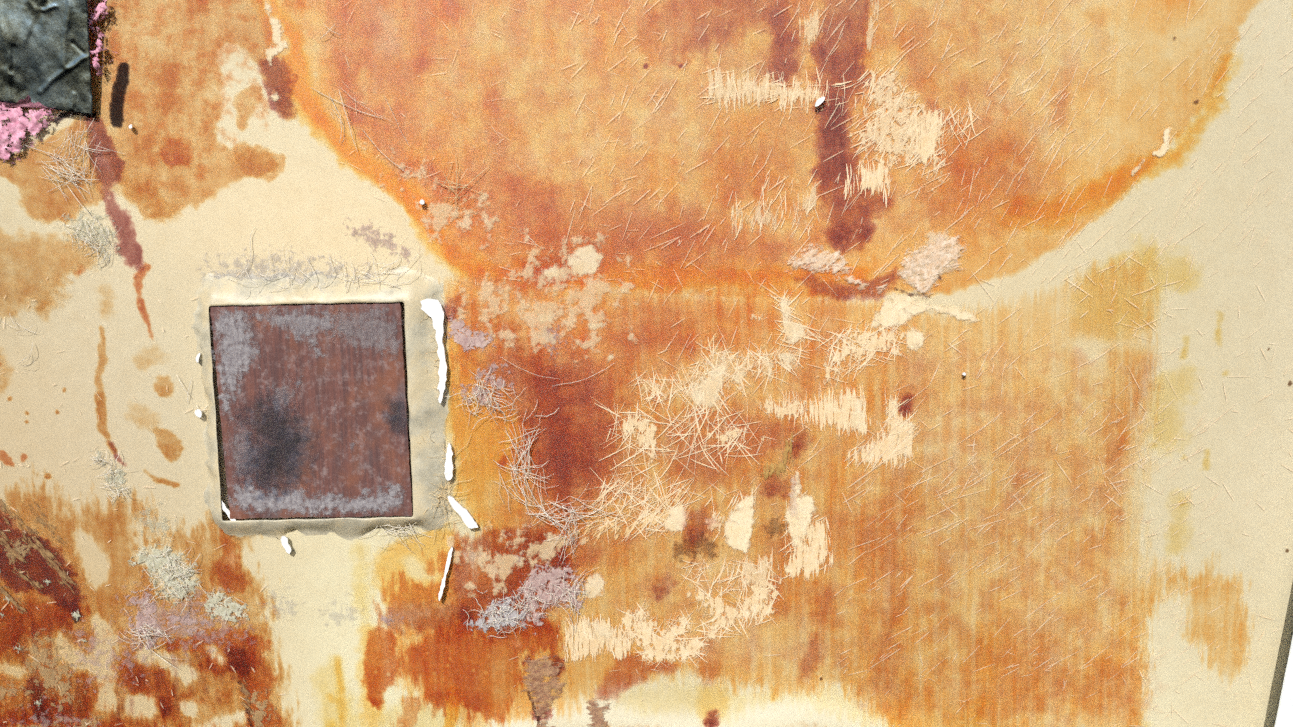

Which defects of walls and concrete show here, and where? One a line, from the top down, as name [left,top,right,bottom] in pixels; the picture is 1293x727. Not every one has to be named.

spalling [785,233,964,298]
peeling [420,299,447,404]
peeling [444,442,479,529]